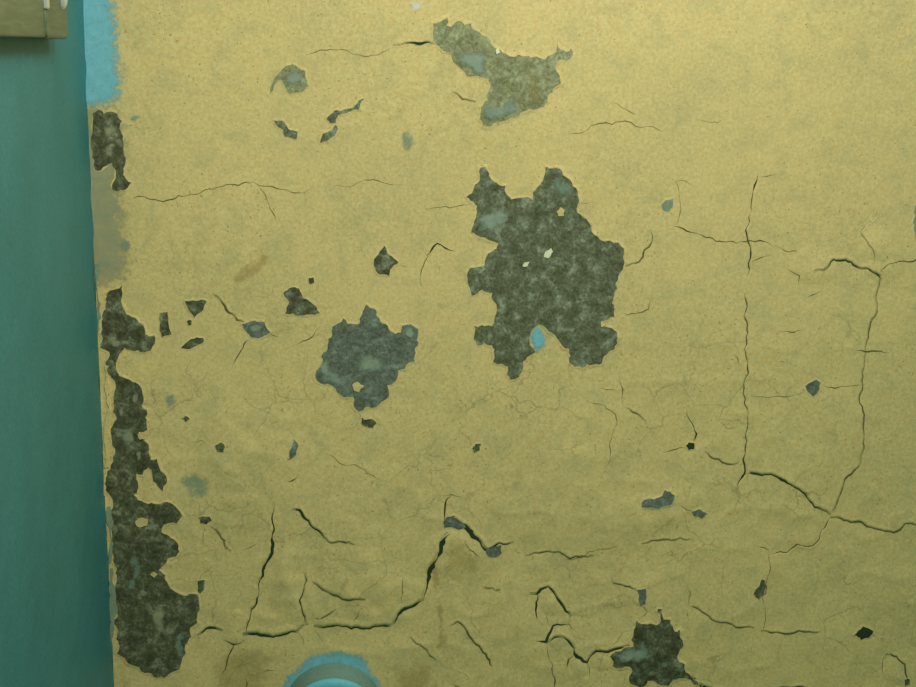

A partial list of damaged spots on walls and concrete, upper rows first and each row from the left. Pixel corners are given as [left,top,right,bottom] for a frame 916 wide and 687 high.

peeling [430,14,574,131]
peeling [89,108,134,193]
crack [134,182,310,216]
peeling [463,164,628,383]
crack [626,228,653,266]
peeling [311,302,421,429]
crack [667,174,916,635]
peeling [98,284,208,679]
crack [195,494,613,672]
crack [529,582,630,687]
spalling [608,588,700,687]
crack [641,534,694,544]